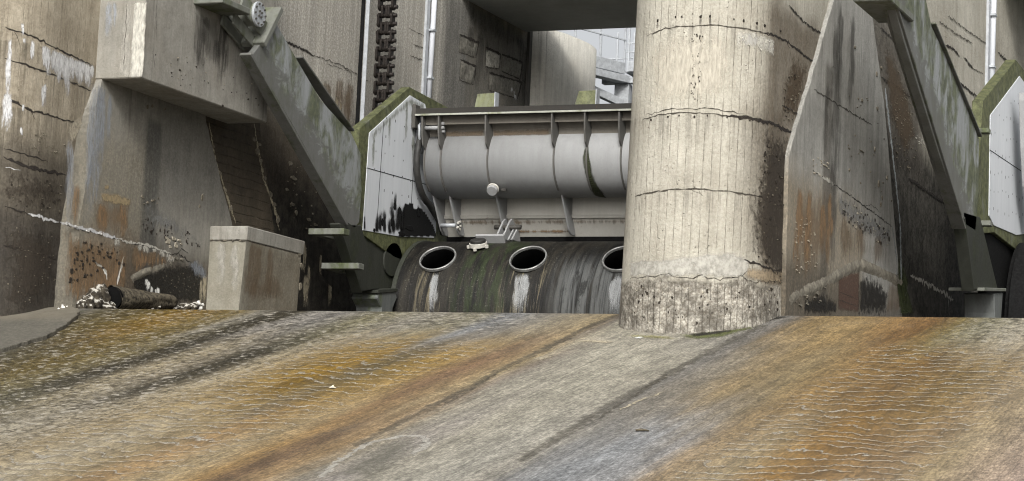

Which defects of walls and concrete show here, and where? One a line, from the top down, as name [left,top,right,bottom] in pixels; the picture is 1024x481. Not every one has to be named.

crack [649,5,821,62]
crack [5,27,91,91]
damp [3,24,94,123]
crack [4,95,74,123]
crack [643,105,797,133]
crack [815,89,872,125]
crack [3,149,66,176]
crack [635,188,771,202]
spalling [619,131,818,334]
rust [793,193,833,261]
damp [513,276,529,304]
damp [610,278,622,303]